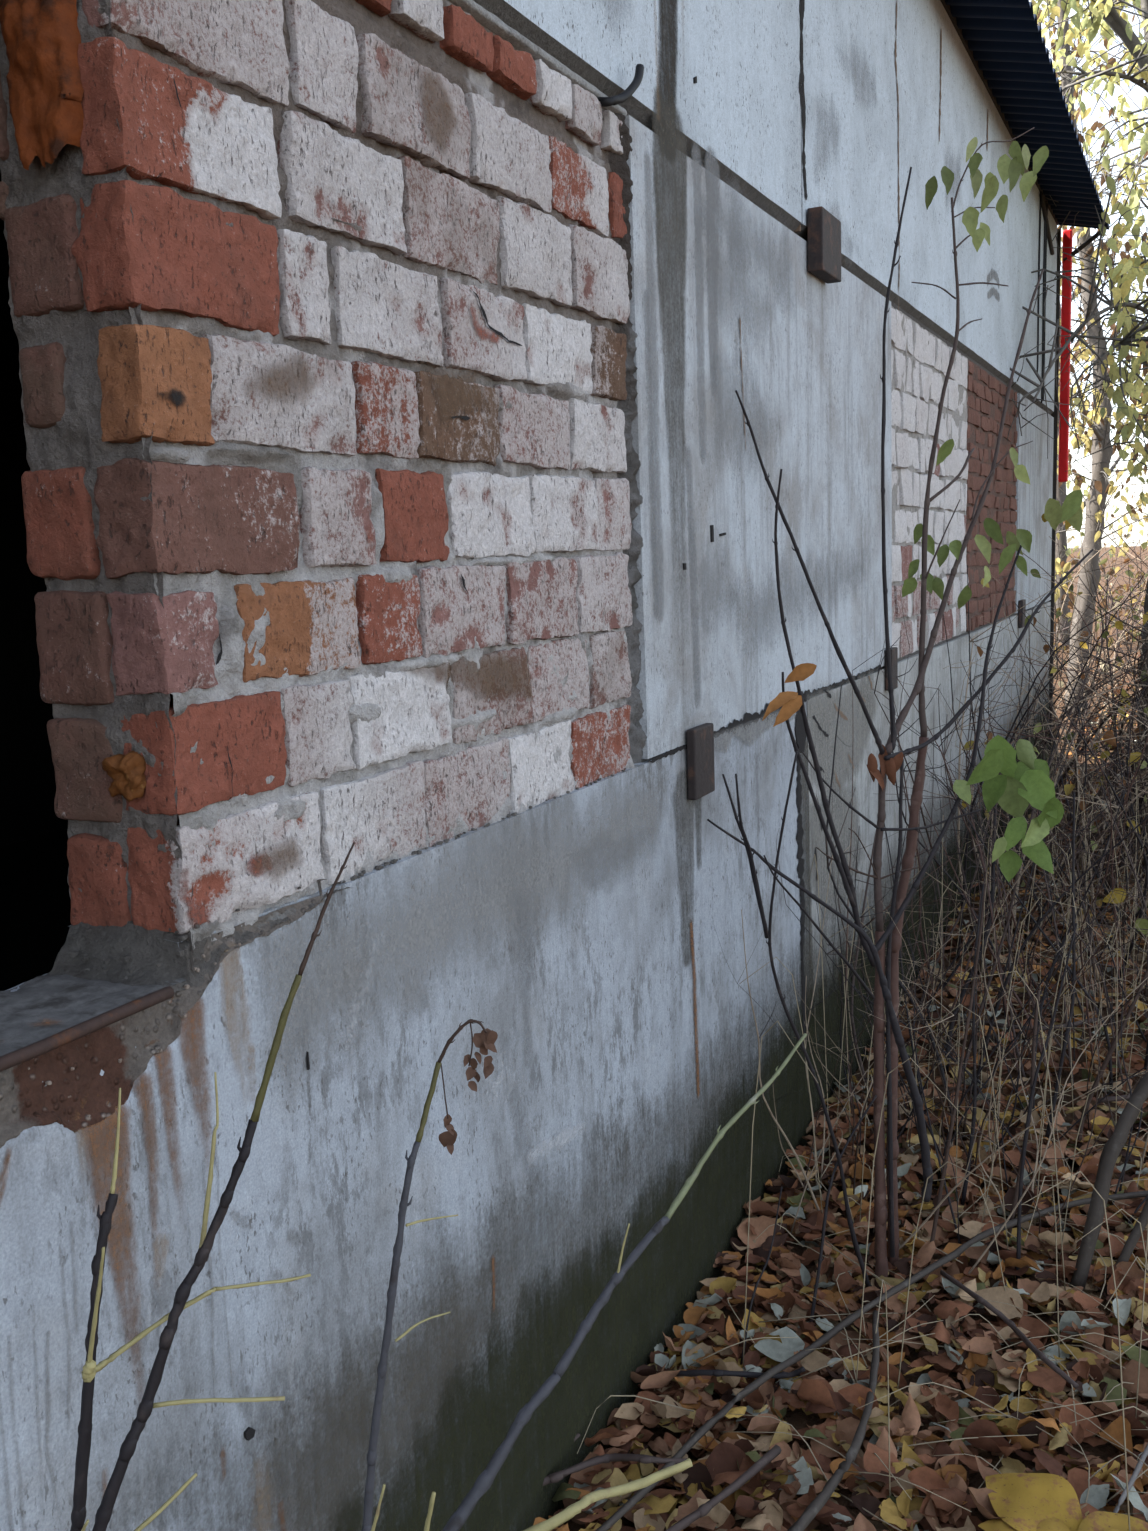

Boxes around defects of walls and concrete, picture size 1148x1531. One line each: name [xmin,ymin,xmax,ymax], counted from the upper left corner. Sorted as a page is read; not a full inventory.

crack [799,0,808,200]
damp [645,0,787,703]
spalling [0,768,626,1148]
rust [76,998,208,1314]